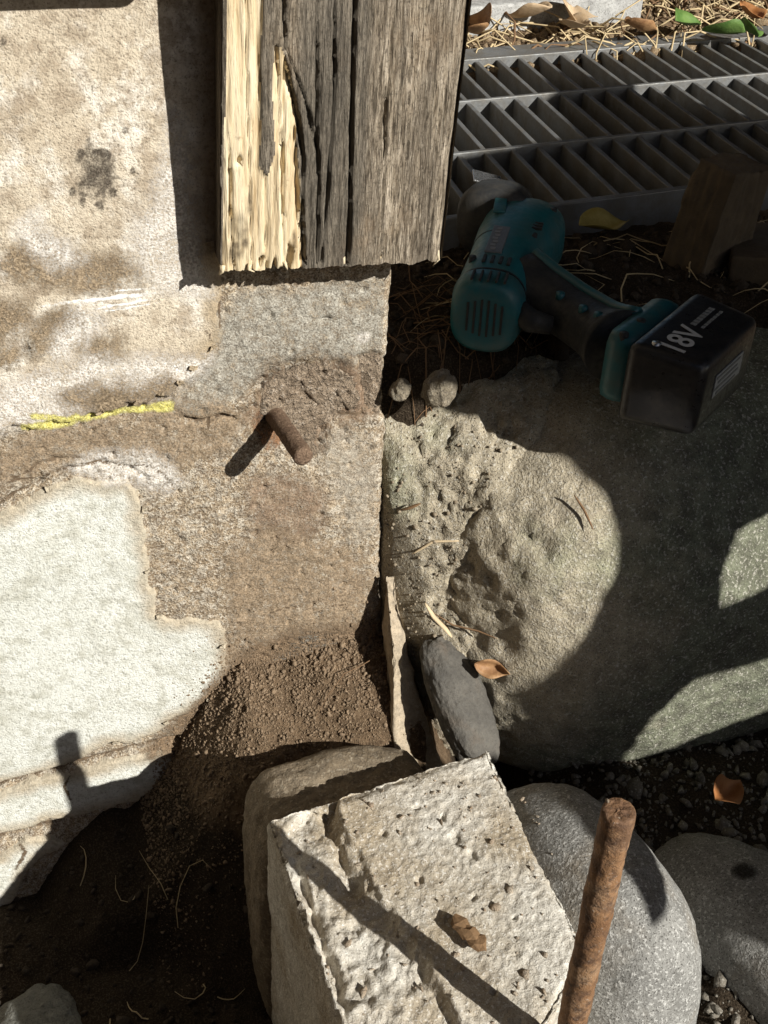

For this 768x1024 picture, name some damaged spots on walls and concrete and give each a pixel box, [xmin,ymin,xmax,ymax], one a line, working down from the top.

leakage [0,113,383,433]
rust [249,400,280,450]